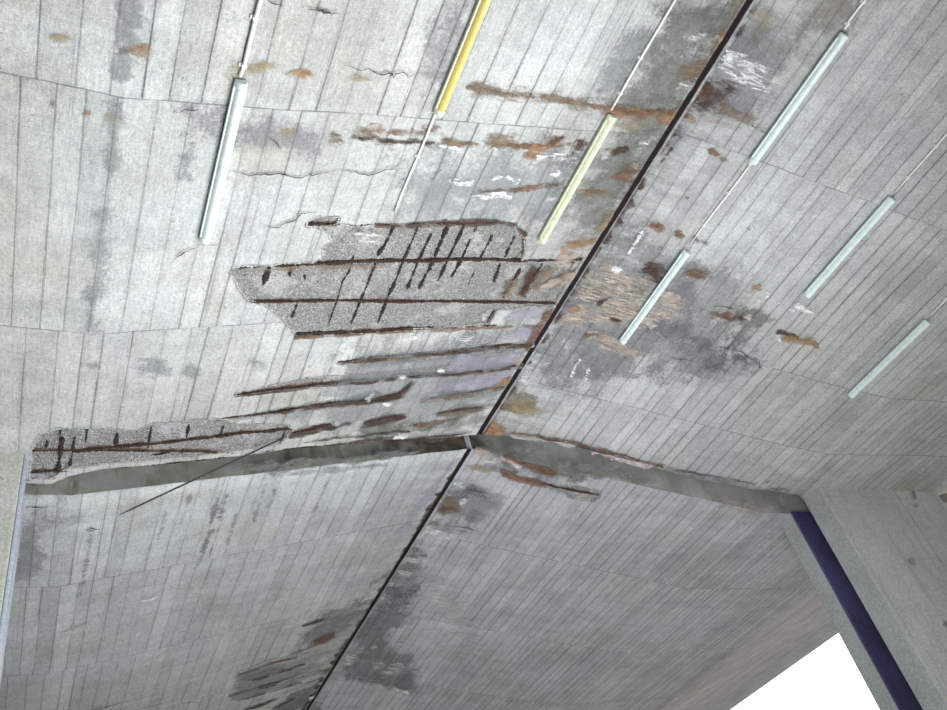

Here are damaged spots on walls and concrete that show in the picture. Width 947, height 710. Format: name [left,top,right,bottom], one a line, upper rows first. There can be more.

crack [262,212,318,229]
crack [233,169,398,178]
crack [344,65,426,78]
spalling [228,216,686,357]
corrosion [354,125,588,160]
corrosion [280,166,665,468]
corrosion [466,0,770,163]
water stain [505,3,814,388]
spalling [27,342,535,481]
water stain [232,342,530,475]
corrosion [464,448,556,487]
water stain [229,547,467,710]